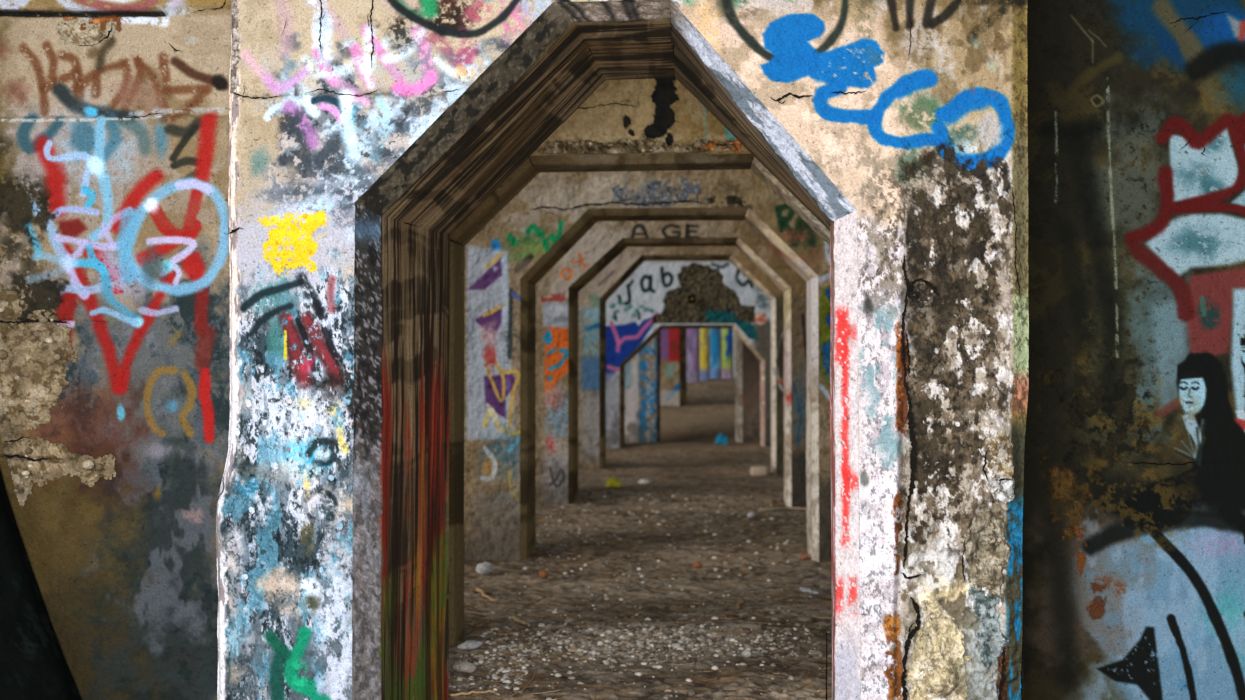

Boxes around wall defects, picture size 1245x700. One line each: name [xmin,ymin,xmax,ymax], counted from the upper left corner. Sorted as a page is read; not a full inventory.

crack [230,0,377,99]
spalling [539,133,741,154]
crack [770,91,865,104]
spalling [908,281,938,308]
spalling [0,233,116,507]
water stain [897,143,1017,555]
crack [900,256,940,700]
spalling [985,431,1014,480]
spalling [905,504,1011,700]